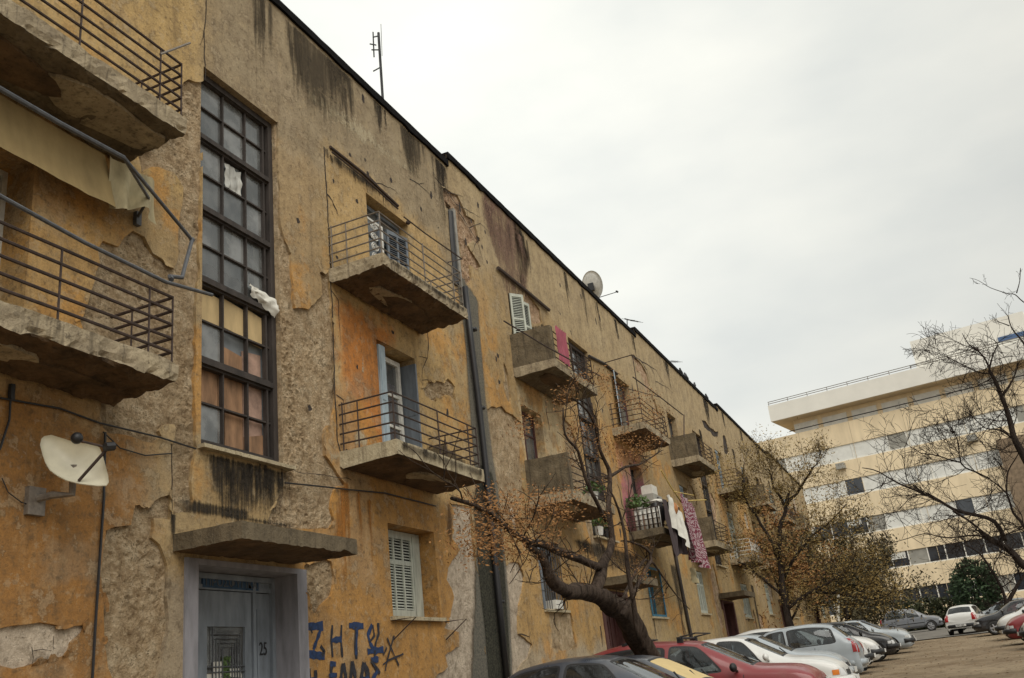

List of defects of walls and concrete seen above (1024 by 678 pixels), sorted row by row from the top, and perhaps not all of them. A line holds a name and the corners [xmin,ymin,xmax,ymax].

leakage [288,22,447,211]
crack [367,173,486,260]
flaking render [0,36,201,678]
flaking render [268,123,343,529]
flaking render [421,380,454,415]
leakage [171,455,291,536]
flaking render [487,407,522,540]
flaking render [304,560,336,613]
flaking render [404,472,486,678]